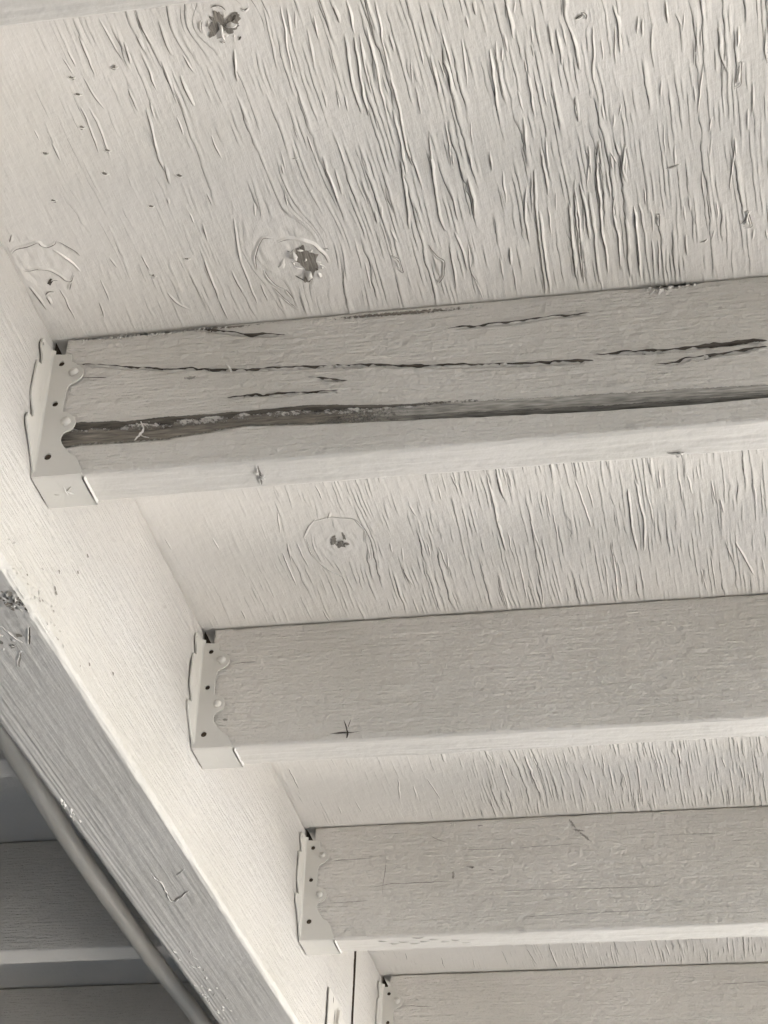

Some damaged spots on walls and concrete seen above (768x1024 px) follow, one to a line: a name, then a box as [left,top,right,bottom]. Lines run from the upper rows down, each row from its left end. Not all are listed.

peeling [206,13,241,41]
crack [34,0,768,325]
crack [9,236,79,320]
peeling [278,249,326,281]
hole [330,532,350,548]
crack [213,451,768,625]
crack [347,737,768,850]